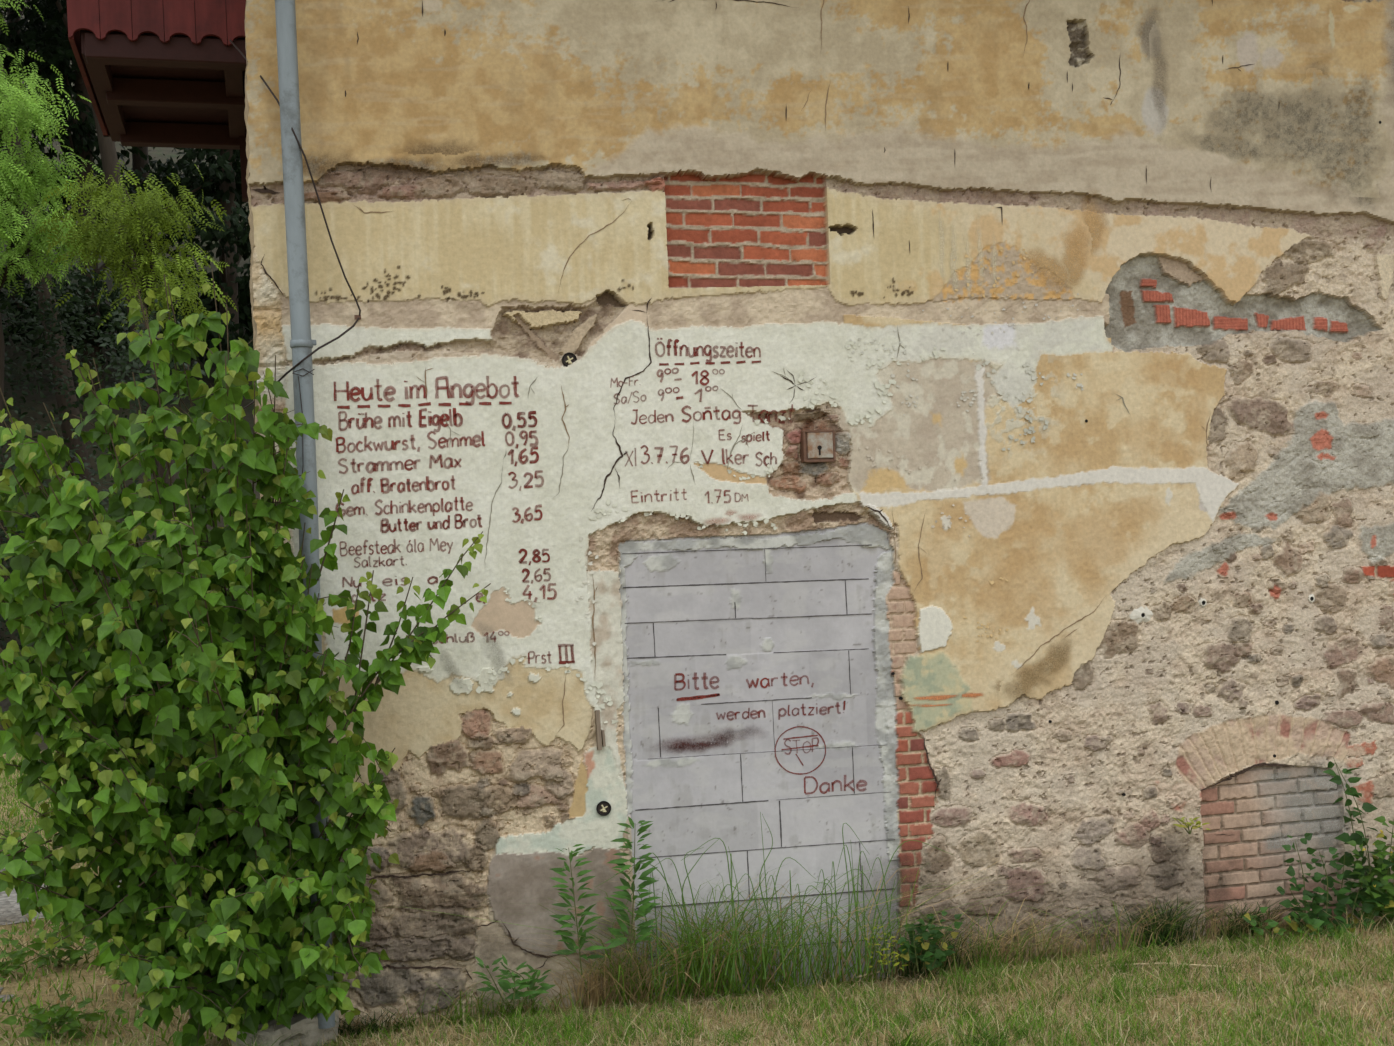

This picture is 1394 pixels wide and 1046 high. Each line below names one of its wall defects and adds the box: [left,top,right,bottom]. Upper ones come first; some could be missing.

spalling [304,165,665,204]
crack [560,198,631,284]
spalling [588,371,904,582]
crack [1014,596,1106,673]
spalling [823,178,1394,976]
spalling [336,663,627,1034]
spalling [621,831,638,1000]